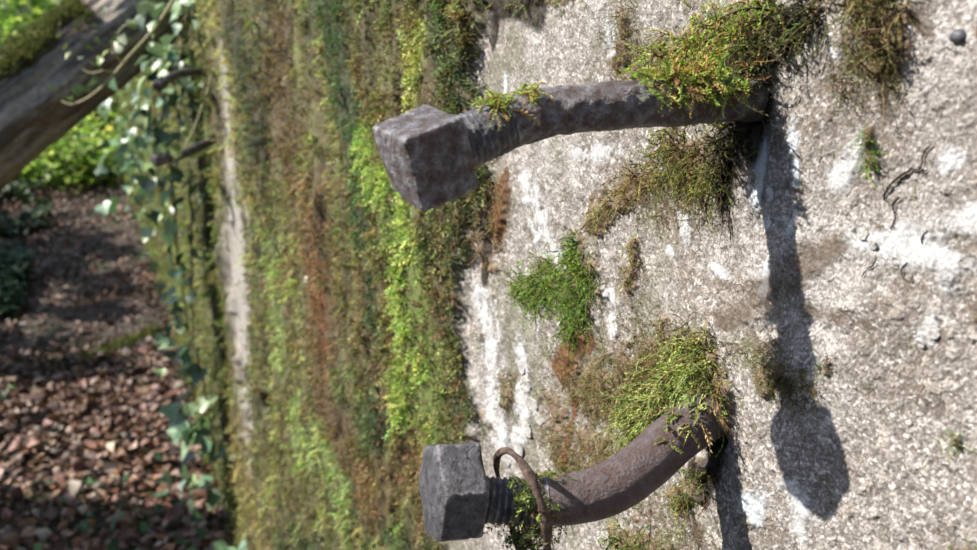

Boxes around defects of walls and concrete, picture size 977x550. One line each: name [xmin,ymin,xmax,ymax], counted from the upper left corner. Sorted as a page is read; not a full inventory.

rust [492,170,511,244]
water stain [471,209,530,463]